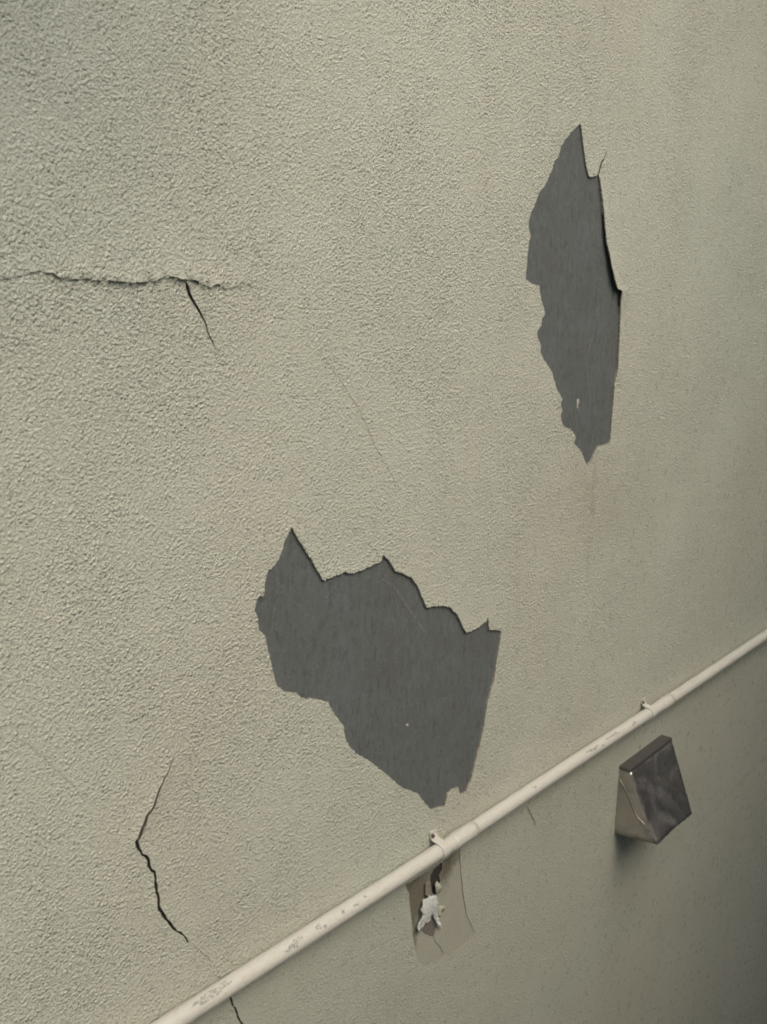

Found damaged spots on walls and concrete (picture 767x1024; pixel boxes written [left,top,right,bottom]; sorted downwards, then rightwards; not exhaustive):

crack [0,271,248,349]
peeling [526,123,623,466]
peeling [255,528,501,810]
crack [135,760,211,961]
spalling [406,849,475,966]
crack [230,997,243,1024]